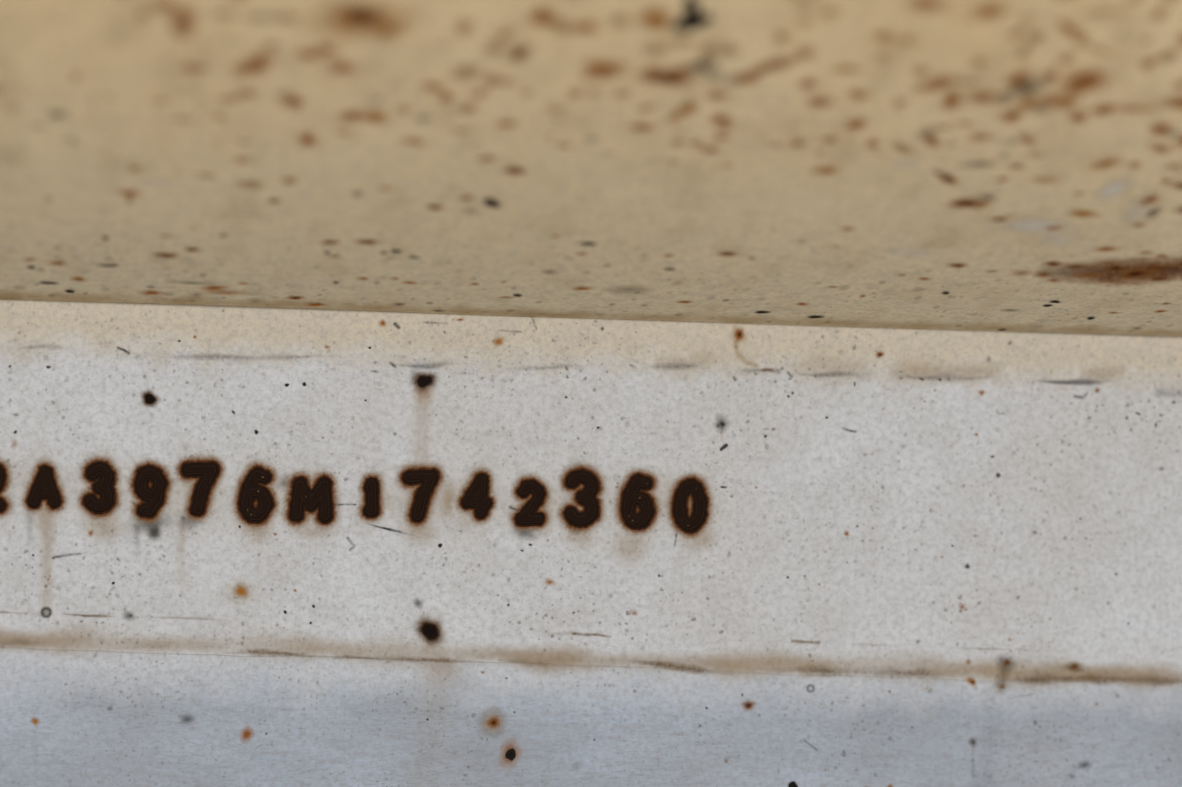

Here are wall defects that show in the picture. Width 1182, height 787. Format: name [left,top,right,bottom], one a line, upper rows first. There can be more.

rust [340,10,382,28]
rust [648,68,684,84]
rust [1044,74,1100,121]
rust [1039,248,1182,284]
rust [418,620,441,643]
rust [505,747,516,761]